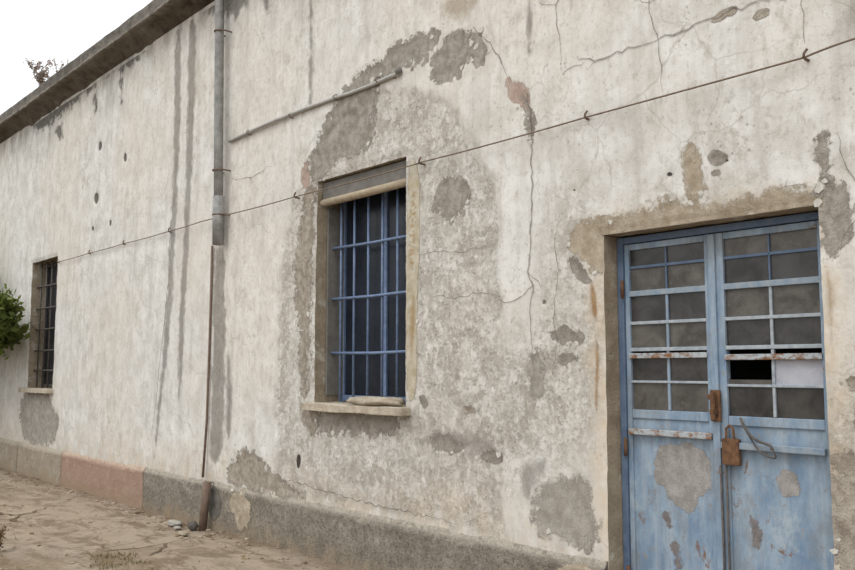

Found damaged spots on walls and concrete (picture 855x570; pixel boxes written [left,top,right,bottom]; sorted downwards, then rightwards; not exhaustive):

crack [539,0,805,86]
flaking render [292,27,487,399]
crack [433,90,560,393]
flaking render [567,130,855,284]
flaking render [301,411,406,442]
flaking render [527,347,546,398]
flaking render [550,324,585,368]
flaking render [839,376,855,391]
flaking render [226,446,306,533]
flaking render [529,473,600,570]
peeling [670,541,683,570]
peeling [653,442,711,529]